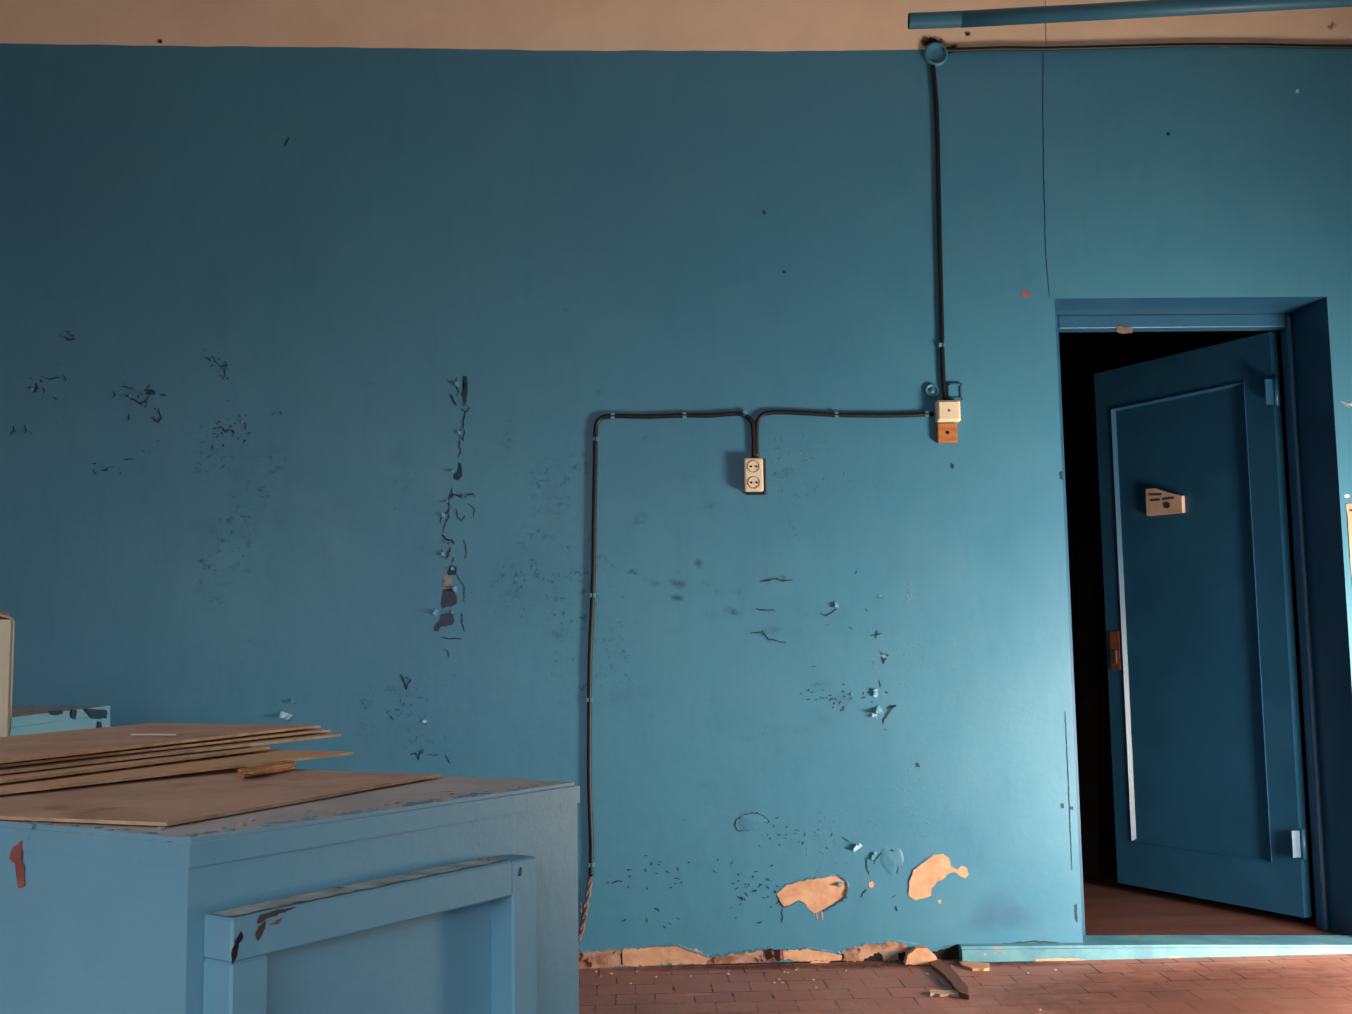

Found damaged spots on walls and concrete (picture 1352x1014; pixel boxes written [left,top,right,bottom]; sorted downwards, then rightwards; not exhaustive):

peeling [432,376,475,656]
flaking render [713,817,894,920]
flaking render [892,854,969,911]
flaking render [579,939,959,969]